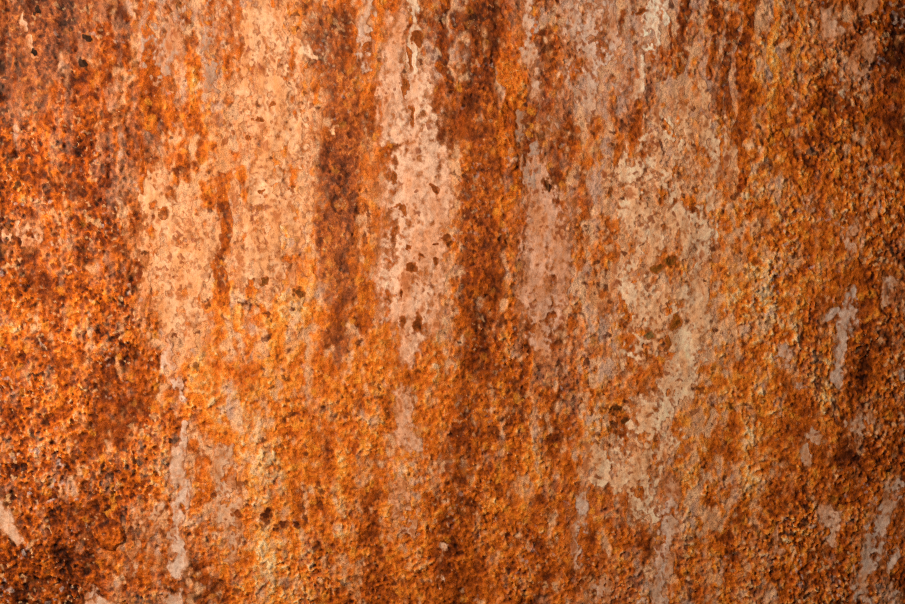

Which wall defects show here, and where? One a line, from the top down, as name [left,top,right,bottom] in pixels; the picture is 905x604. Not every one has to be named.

rust [138,24,164,134]
rust [185,62,201,118]
rust [663,0,691,81]
rust [706,0,758,192]
rust [765,0,806,159]
rust [211,172,233,310]
rust [300,0,413,426]
rust [424,0,527,604]
rust [129,328,160,415]
rust [198,329,222,420]
rust [232,362,260,433]
rust [93,519,126,551]